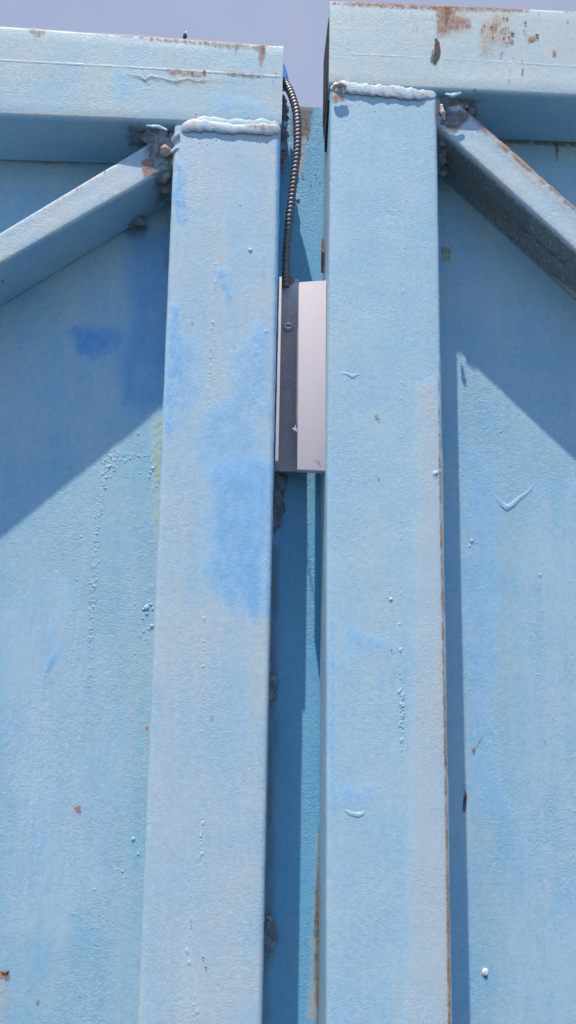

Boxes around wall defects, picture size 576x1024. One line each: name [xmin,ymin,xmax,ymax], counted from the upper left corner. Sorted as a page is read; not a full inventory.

corrosion [106,33,266,77]
corrosion [333,1,539,82]
crack [129,74,218,83]
peeling [440,92,462,120]
peeling [146,125,180,153]
corrosion [308,856,320,1022]